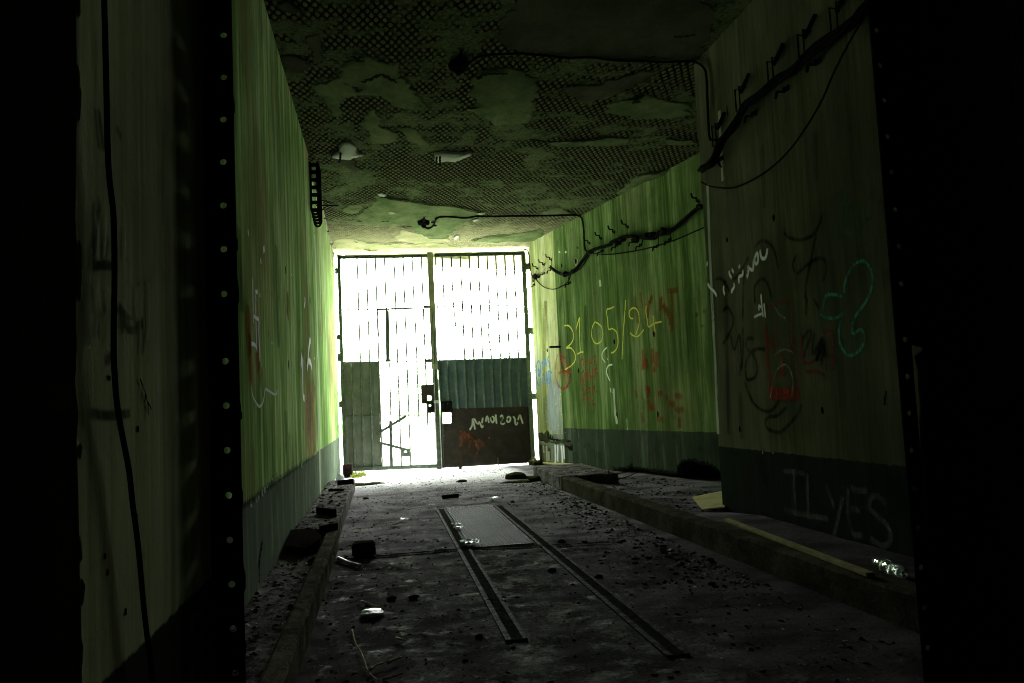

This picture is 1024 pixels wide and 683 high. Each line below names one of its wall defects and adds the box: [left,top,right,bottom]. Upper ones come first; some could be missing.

peeling [311,56,427,118]
peeling [467,67,540,126]
peeling [603,93,692,120]
peeling [327,141,363,172]
peeling [359,109,472,165]
peeling [333,193,544,256]